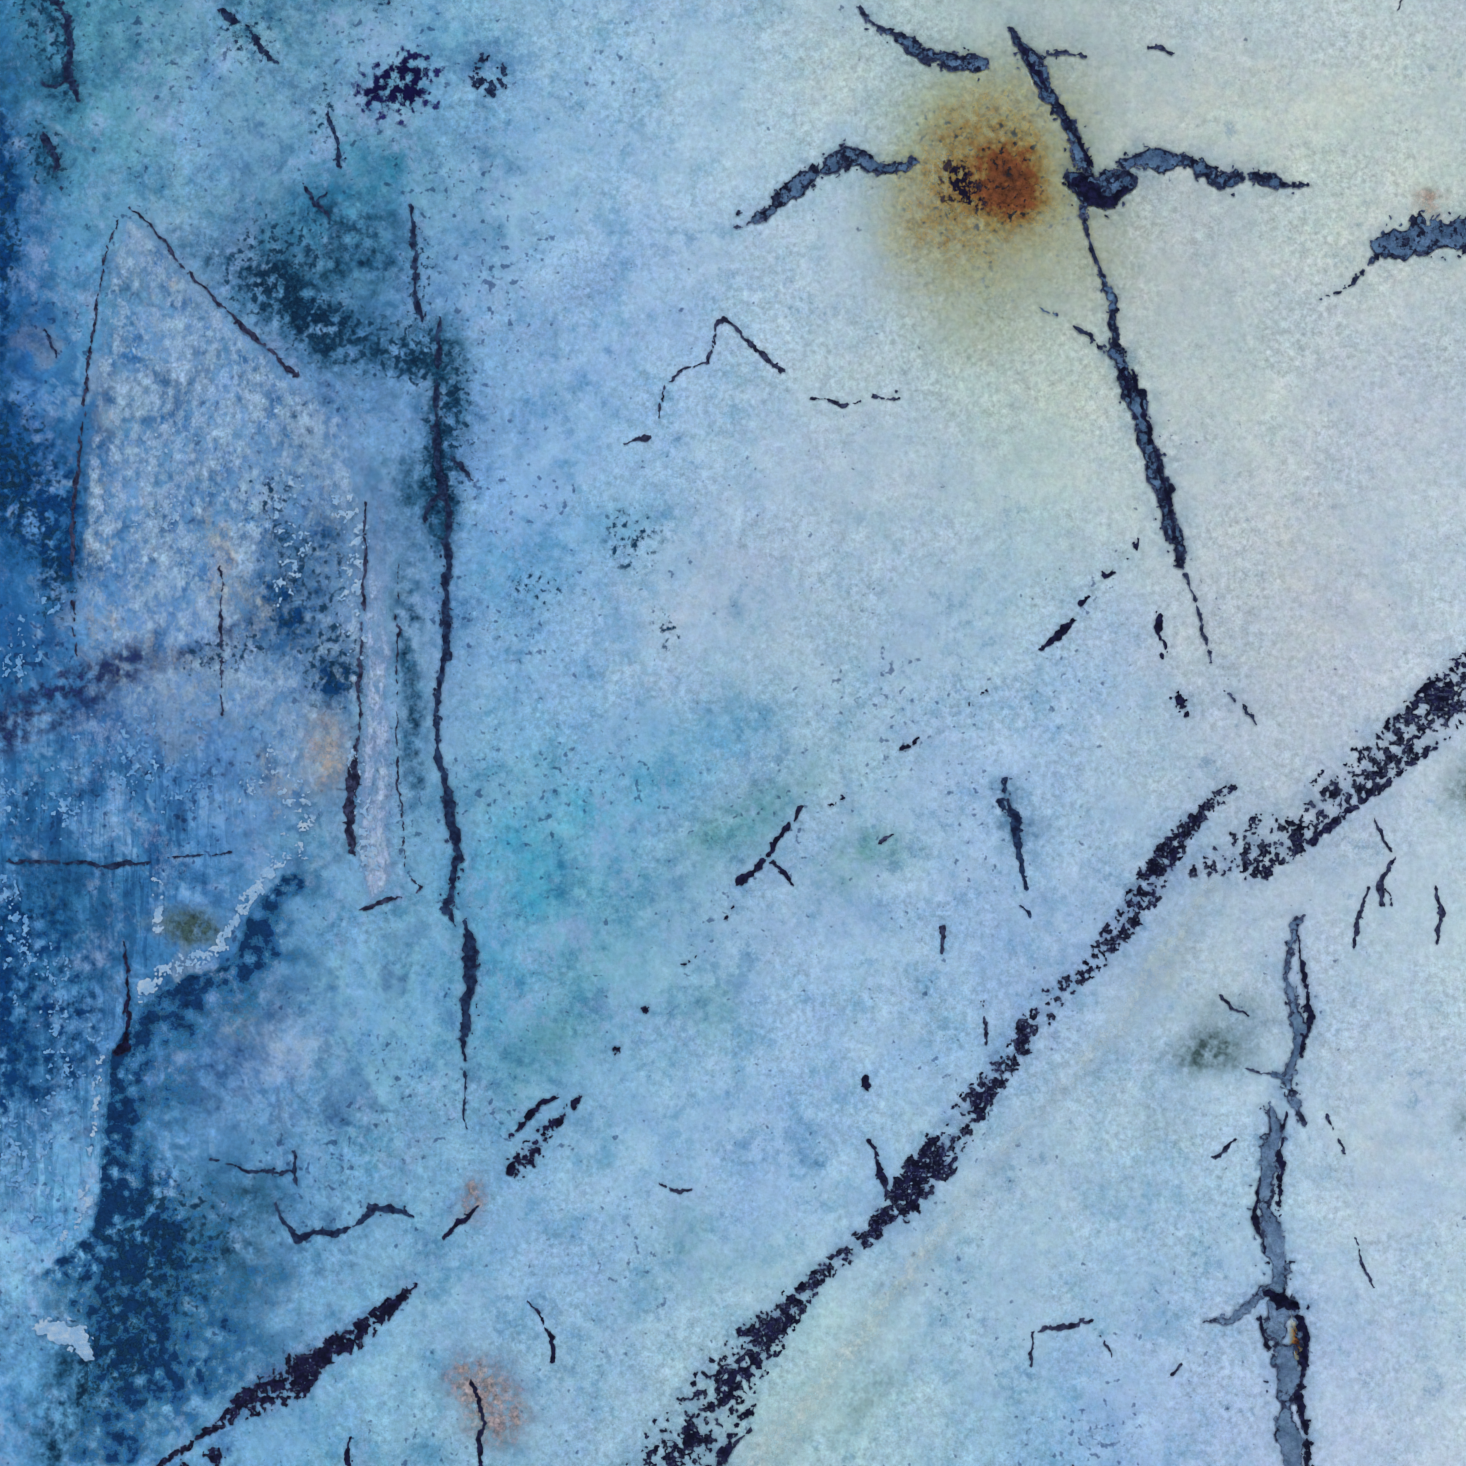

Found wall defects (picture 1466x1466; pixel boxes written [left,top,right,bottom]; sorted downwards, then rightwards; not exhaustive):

crack [733,139,920,229]
rust [907,92,1057,263]
crack [623,316,786,445]
crack [856,5,1310,725]
crack [342,204,481,1129]
peeling [0,222,418,1466]
crack [735,805,804,886]
crack [996,777,1031,918]
crack [1352,818,1396,949]
crack [209,1150,479,1244]
crack [1202,914,1346,1466]
crack [1028,1318,1112,1367]